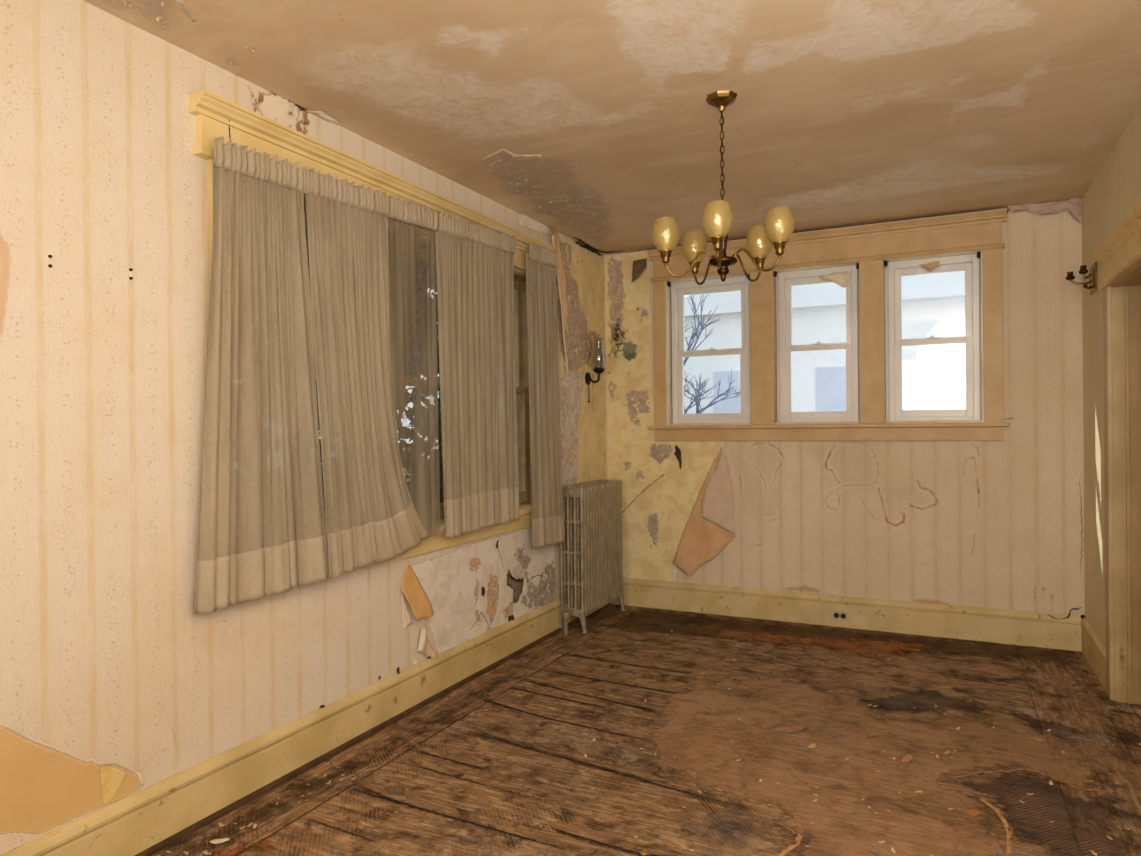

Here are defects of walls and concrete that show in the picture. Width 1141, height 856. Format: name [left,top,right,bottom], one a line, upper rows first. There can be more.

peeling [83,0,216,39]
leakage [290,109,309,134]
leakage [0,209,22,355]
peeling [271,0,1059,486]
flaking render [647,512,659,548]
peeling [672,447,736,576]
peeling [401,564,438,664]
flaking render [507,543,560,622]